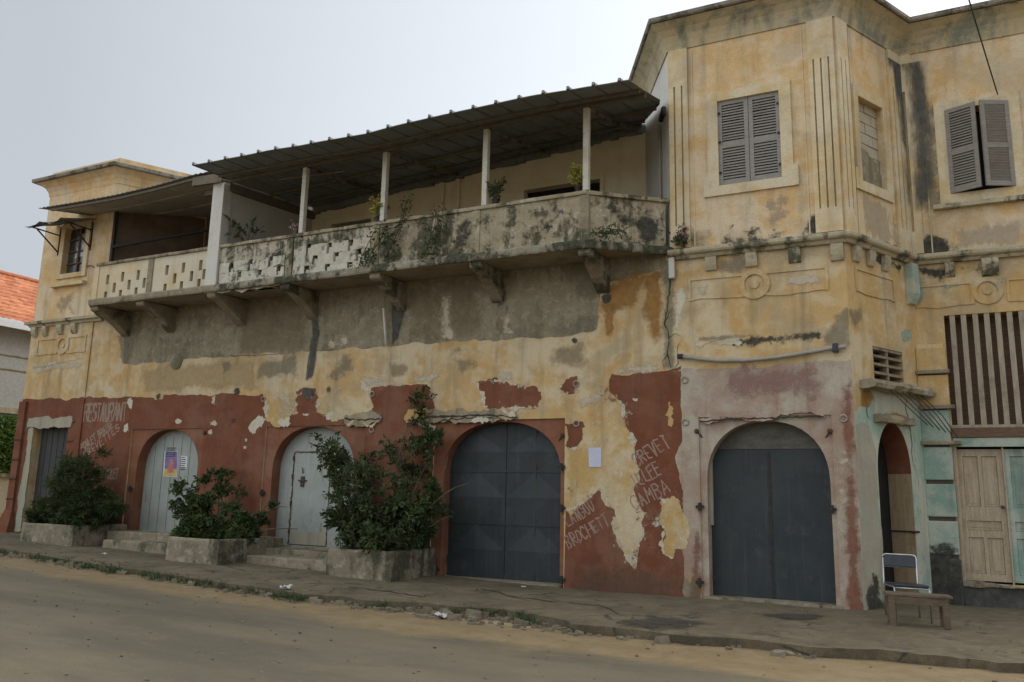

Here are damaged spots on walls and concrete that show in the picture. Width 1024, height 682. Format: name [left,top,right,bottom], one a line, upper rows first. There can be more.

water stain [888,57,939,209]
water stain [456,220,471,251]
water stain [532,202,563,232]
water stain [606,197,664,243]
water stain [923,222,1018,254]
crack [662,273,680,371]
peeling [243,392,376,449]
peeling [566,381,690,569]